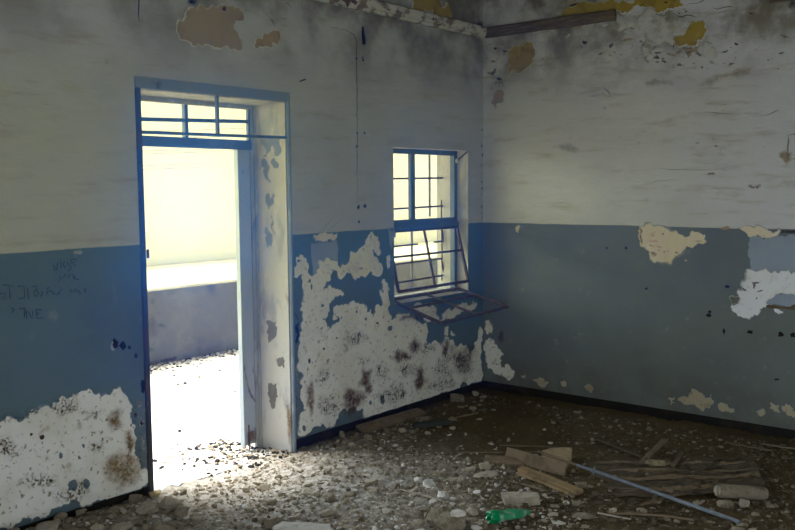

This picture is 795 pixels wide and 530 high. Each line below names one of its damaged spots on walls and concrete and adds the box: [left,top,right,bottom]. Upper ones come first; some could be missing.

peeling [176,3,245,52]
peeling [557,0,687,17]
peeling [580,20,744,71]
peeling [638,222,707,266]
peeling [721,224,781,239]
peeling [725,267,795,320]
peeling [266,320,277,343]
peeling [294,229,549,437]
leakage [444,347,473,373]
peeling [267,383,278,409]
peeling [668,389,735,413]
peeling [0,380,148,530]